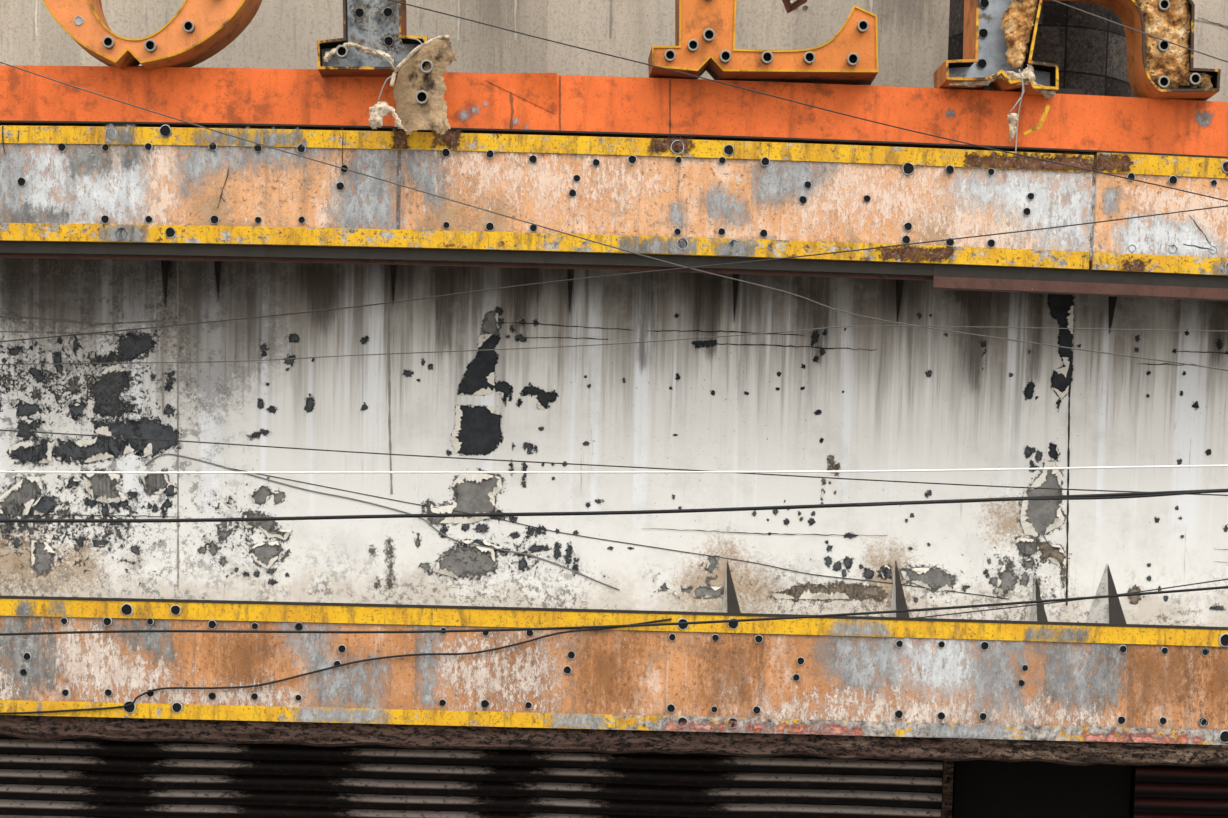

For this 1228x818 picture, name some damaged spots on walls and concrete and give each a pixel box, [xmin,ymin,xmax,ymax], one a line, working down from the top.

rust [389,129,413,149]
rust [429,130,464,150]
rust [647,136,695,155]
rust [963,150,1134,173]
rust [191,190,231,226]
rust [877,214,957,263]
peeling [801,330,828,369]
peeling [1046,294,1081,411]
peeling [1022,381,1039,400]
peeling [649,438,1072,612]
peeling [1126,563,1169,604]
peeling [658,617,1204,744]